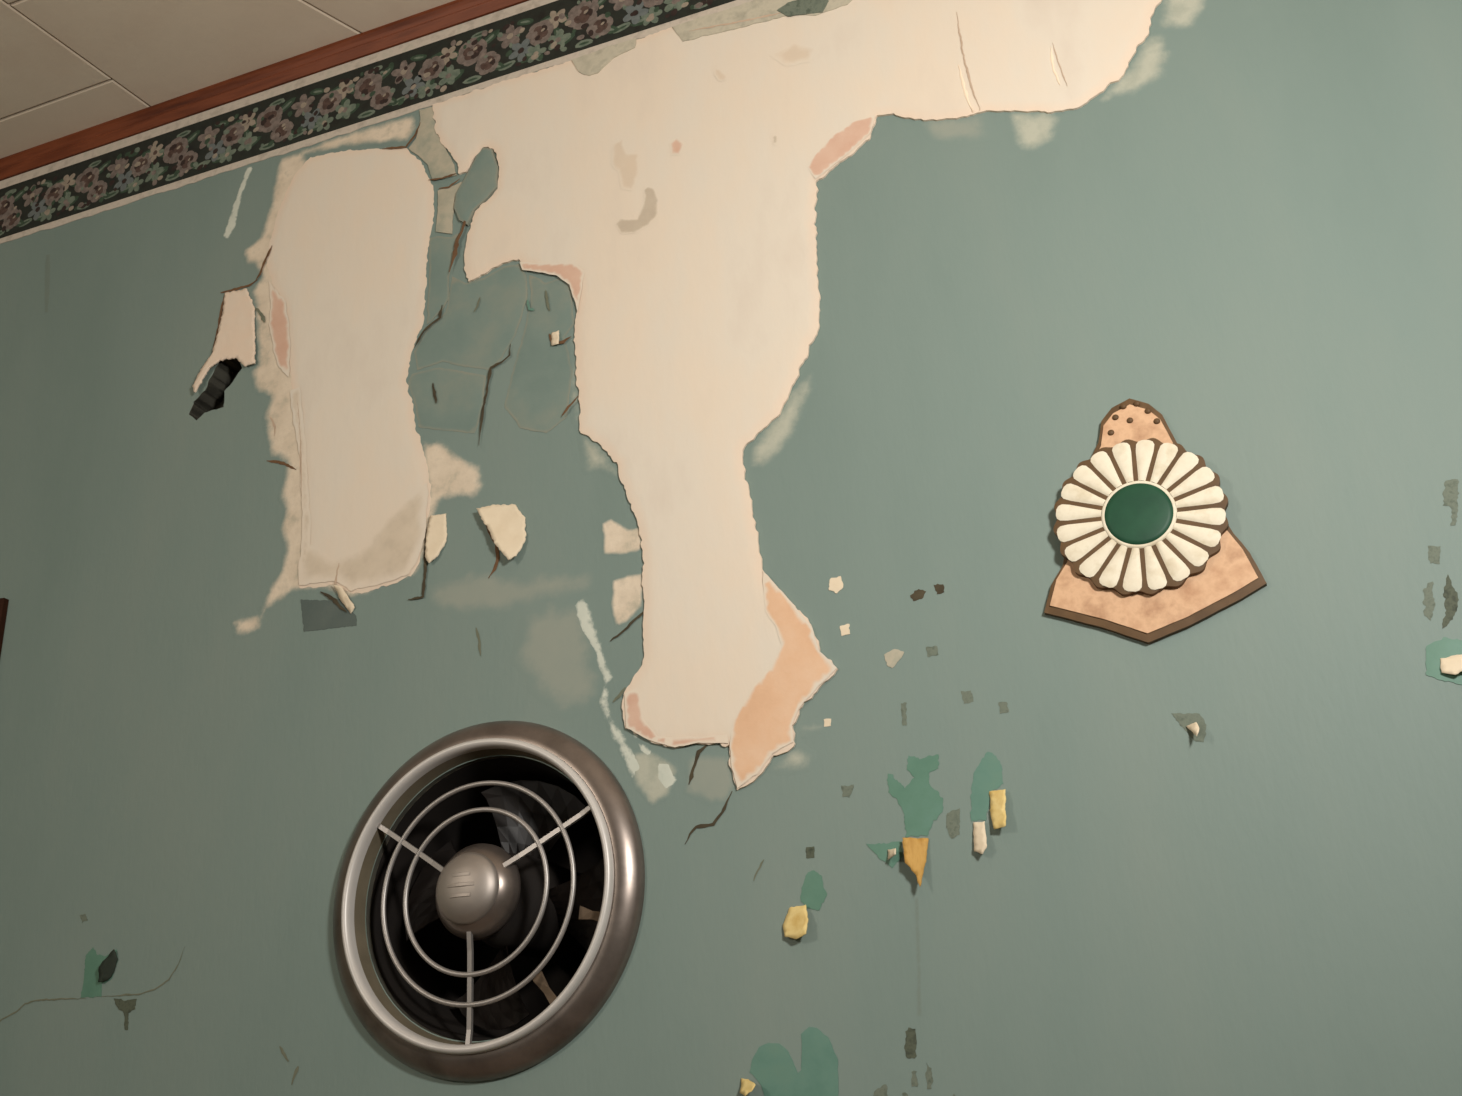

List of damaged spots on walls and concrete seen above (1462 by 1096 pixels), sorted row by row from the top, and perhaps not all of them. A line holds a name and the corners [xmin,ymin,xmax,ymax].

peeling [190,0,1212,790]
peeling [1423,546,1462,685]
crack [688,745,707,785]
crack [685,791,732,844]
peeling [867,752,1006,886]
peeling [783,846,827,939]
crack [0,947,185,1021]
peeling [81,947,137,1030]
peeling [740,1027,839,1096]